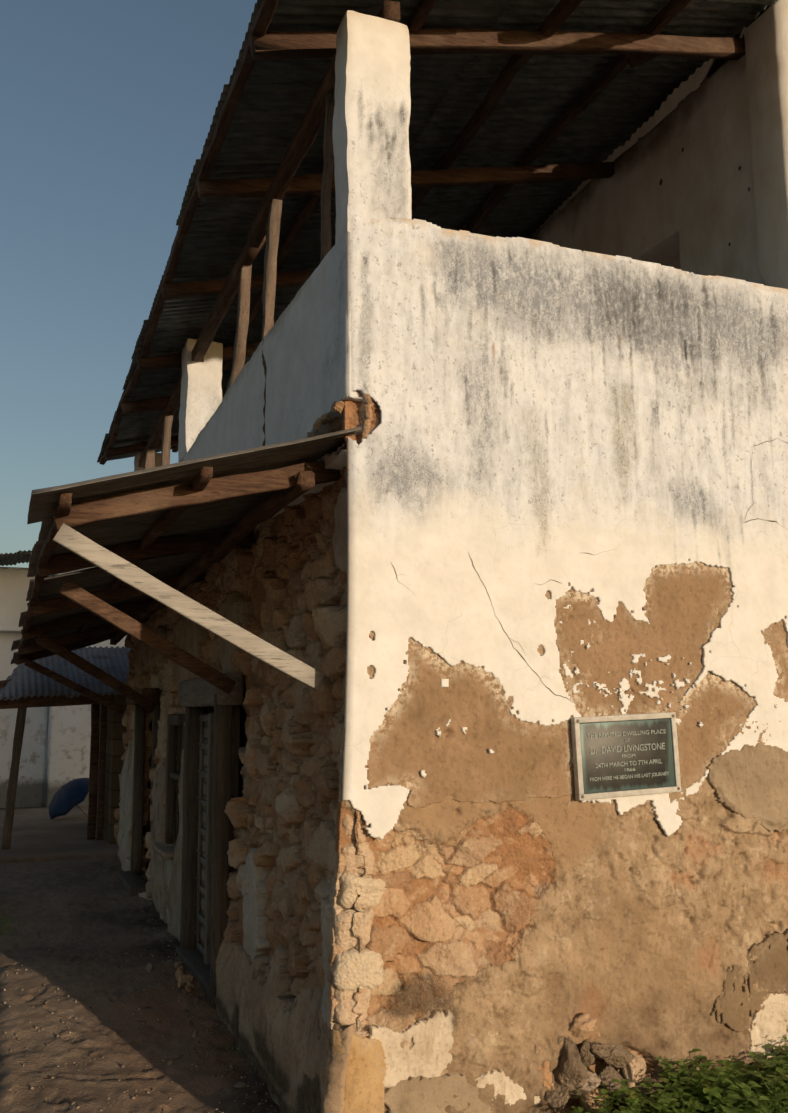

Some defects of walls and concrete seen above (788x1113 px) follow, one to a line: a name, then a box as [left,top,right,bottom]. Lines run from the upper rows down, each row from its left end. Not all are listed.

leakage [439,242,787,368]
crack [260,339,268,446]
spalling [307,391,380,452]
crack [741,438,787,528]
spalling [142,606,182,640]
crack [469,555,574,703]
peeling [761,624,788,708]
spalling [114,635,186,900]
spalling [182,466,757,1044]
flaking render [710,928,788,1032]
leakage [214,993,320,1113]